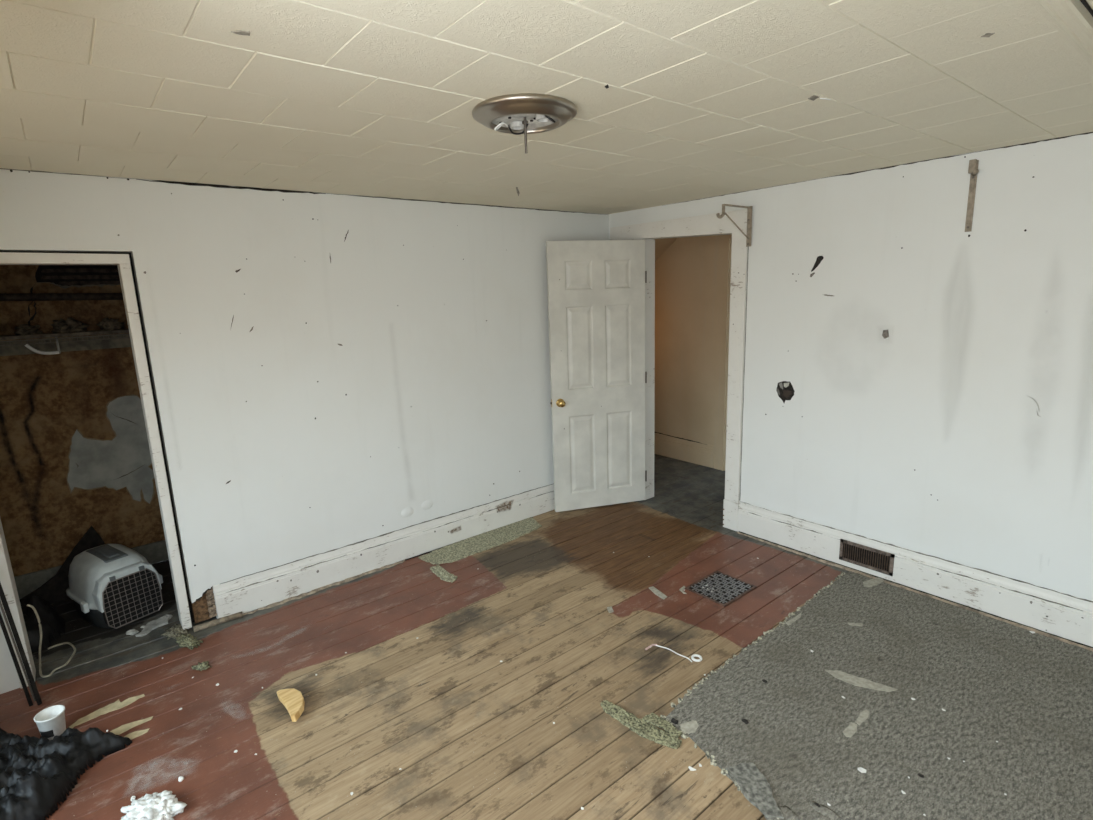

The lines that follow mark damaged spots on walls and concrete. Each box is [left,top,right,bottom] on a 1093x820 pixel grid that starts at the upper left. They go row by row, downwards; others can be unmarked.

crack [1080,0,1093,17]
crack [662,132,1093,206]
peeling [66,394,155,504]
flaking render [190,586,217,623]